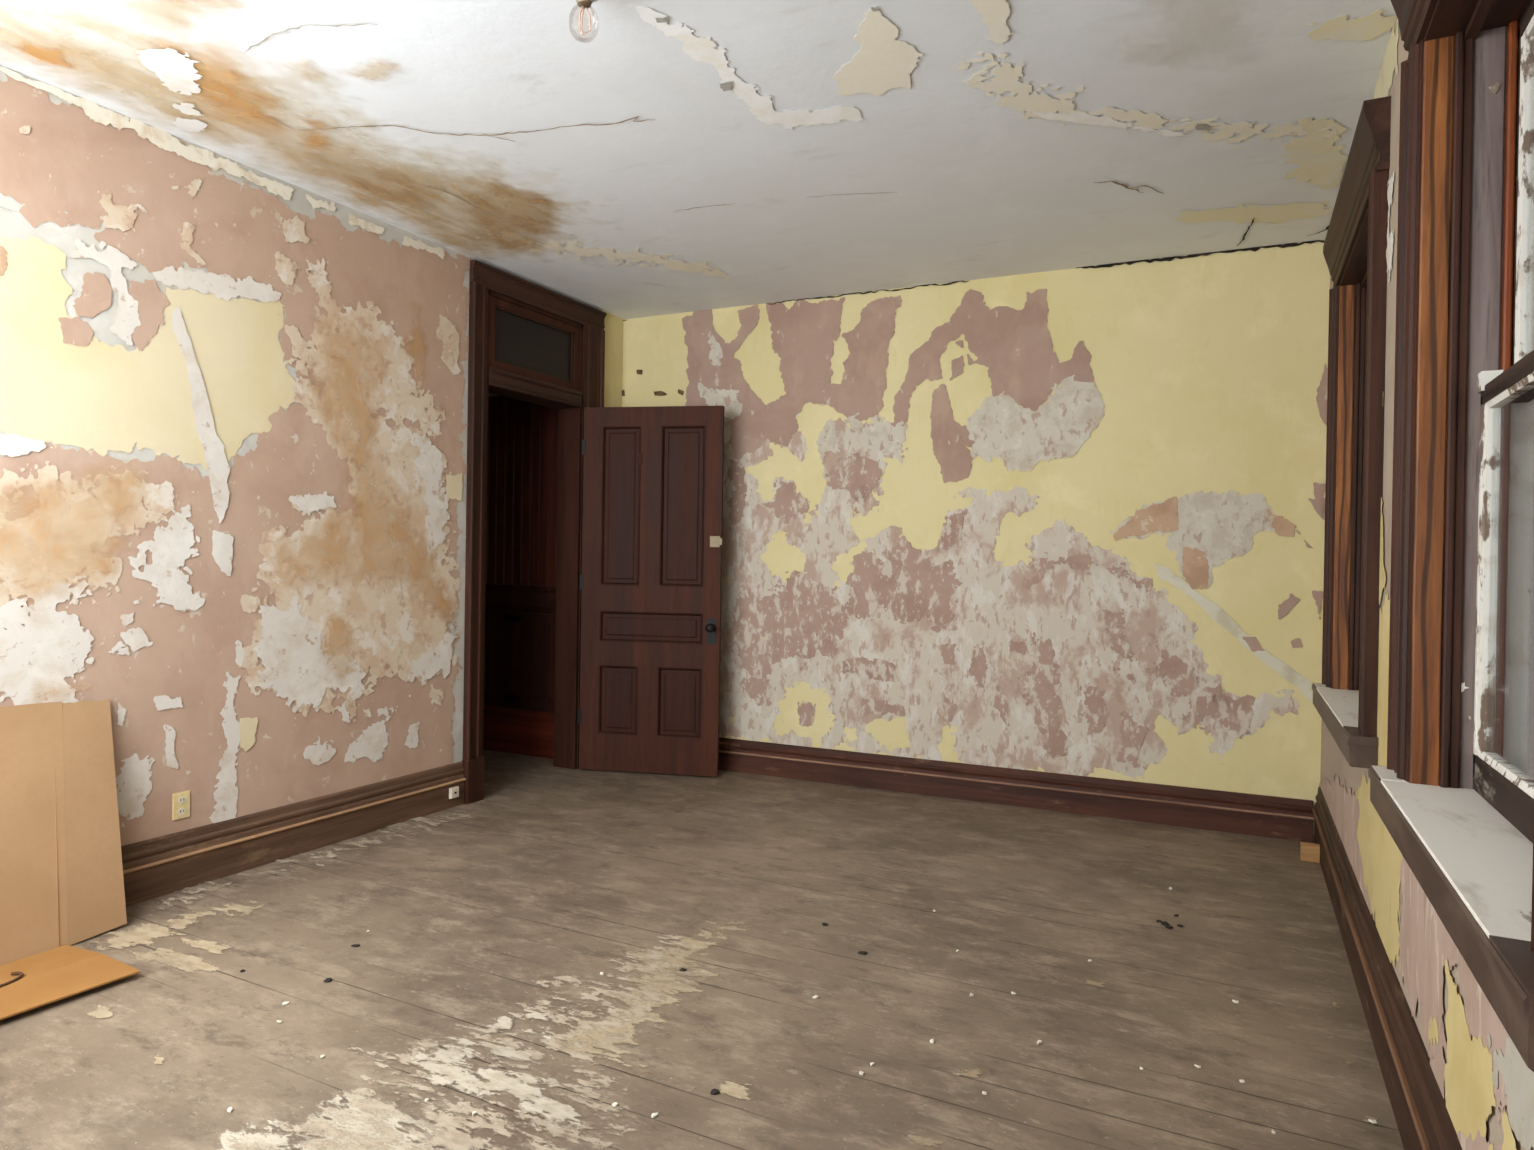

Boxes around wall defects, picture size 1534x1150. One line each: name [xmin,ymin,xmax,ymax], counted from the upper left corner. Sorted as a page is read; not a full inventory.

peeling [636,6,923,130]
crack [266,115,649,142]
peeling [1168,117,1348,225]
peeling [0,48,473,846]
peeling [603,311,642,407]
peeling [654,289,1313,779]
peeling [1308,482,1326,520]
peeling [1316,364,1328,426]
peeling [1278,591,1323,620]
peeling [1319,498,1534,1150]